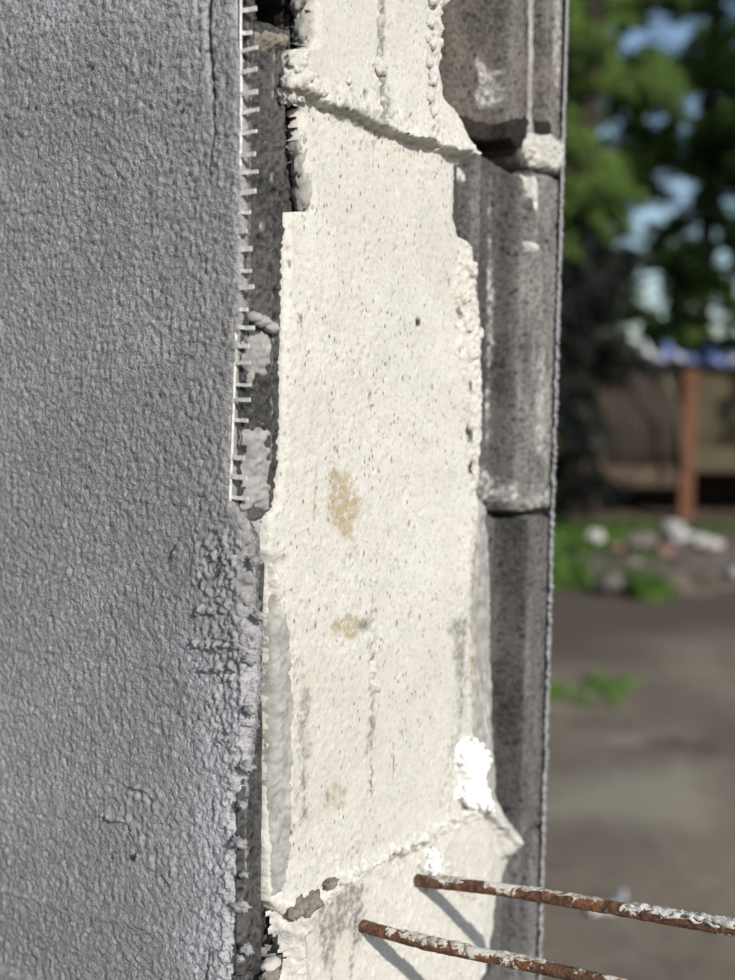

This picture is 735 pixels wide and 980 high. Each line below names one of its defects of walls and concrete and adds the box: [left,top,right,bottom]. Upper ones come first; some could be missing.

spalling [255,0,289,30]
spalling [432,0,450,61]
crack [206,0,216,168]
spalling [459,115,553,153]
spalling [450,238,484,491]
spalling [190,525,286,675]
spalling [235,799,248,810]
spalling [228,835,249,849]
spalling [229,897,252,914]
spalling [235,936,273,964]